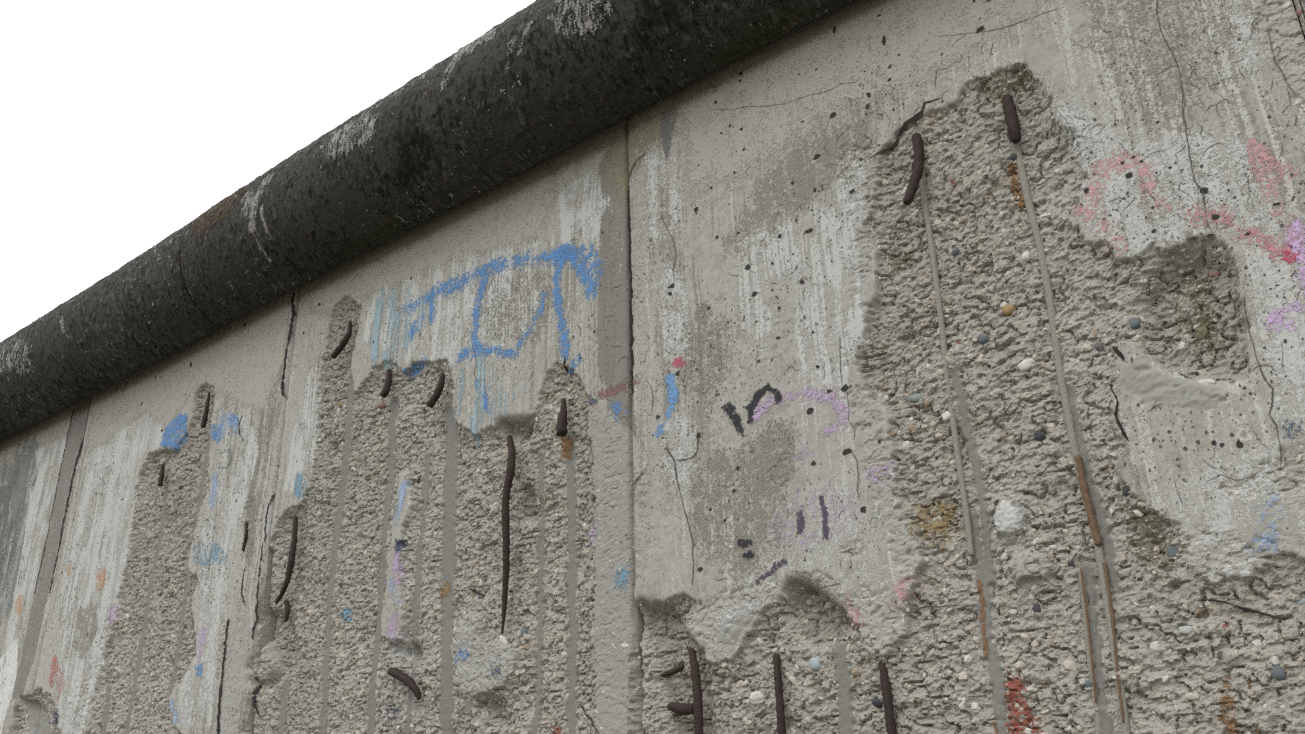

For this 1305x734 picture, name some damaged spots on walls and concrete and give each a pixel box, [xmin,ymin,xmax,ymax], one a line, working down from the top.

spalling [215,622,229,681]
spalling [242,59,1305,734]
crack [717,6,1065,519]
crack [1048,2,1297,234]